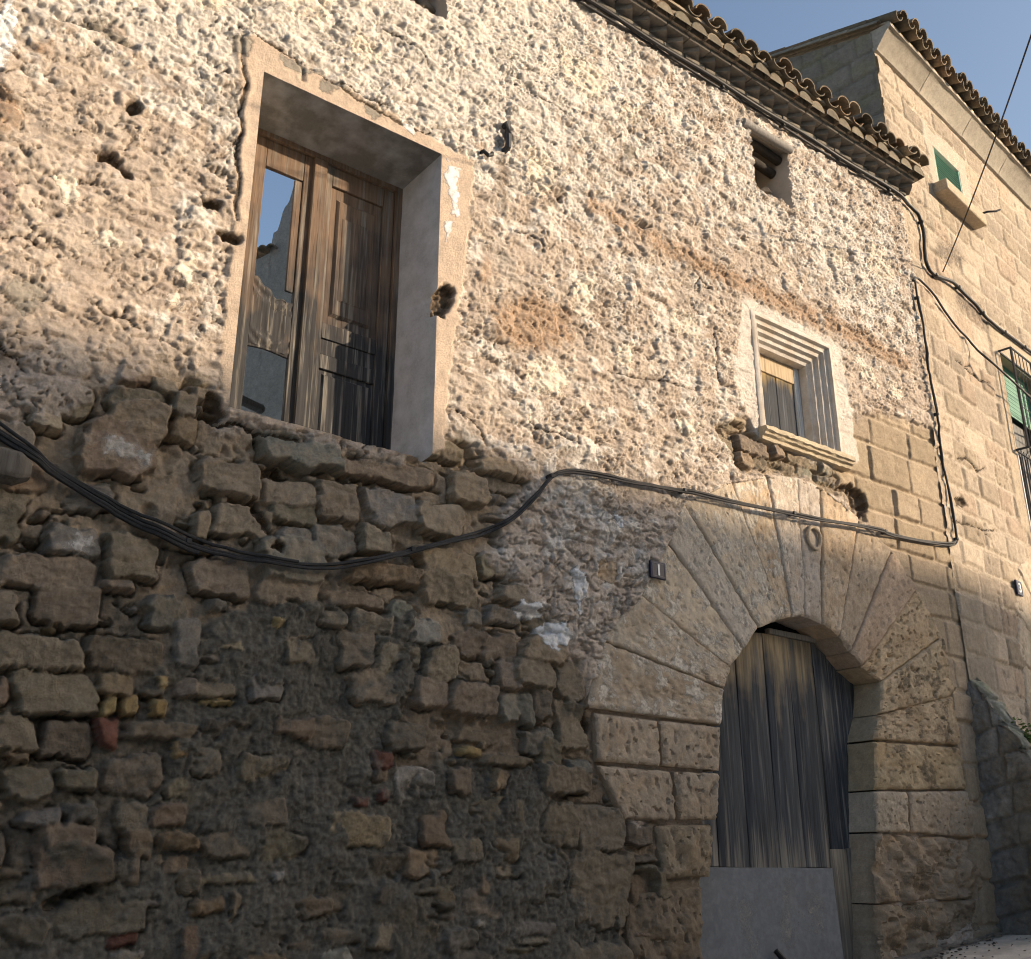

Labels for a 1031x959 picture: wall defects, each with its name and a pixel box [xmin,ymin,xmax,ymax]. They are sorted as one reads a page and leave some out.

crack [238,26,431,135]
crack [233,59,248,220]
spalling [430,285,453,319]
crack [608,370,689,389]
spalling [834,483,866,518]
peeling [569,560,618,615]
peeling [511,599,573,651]